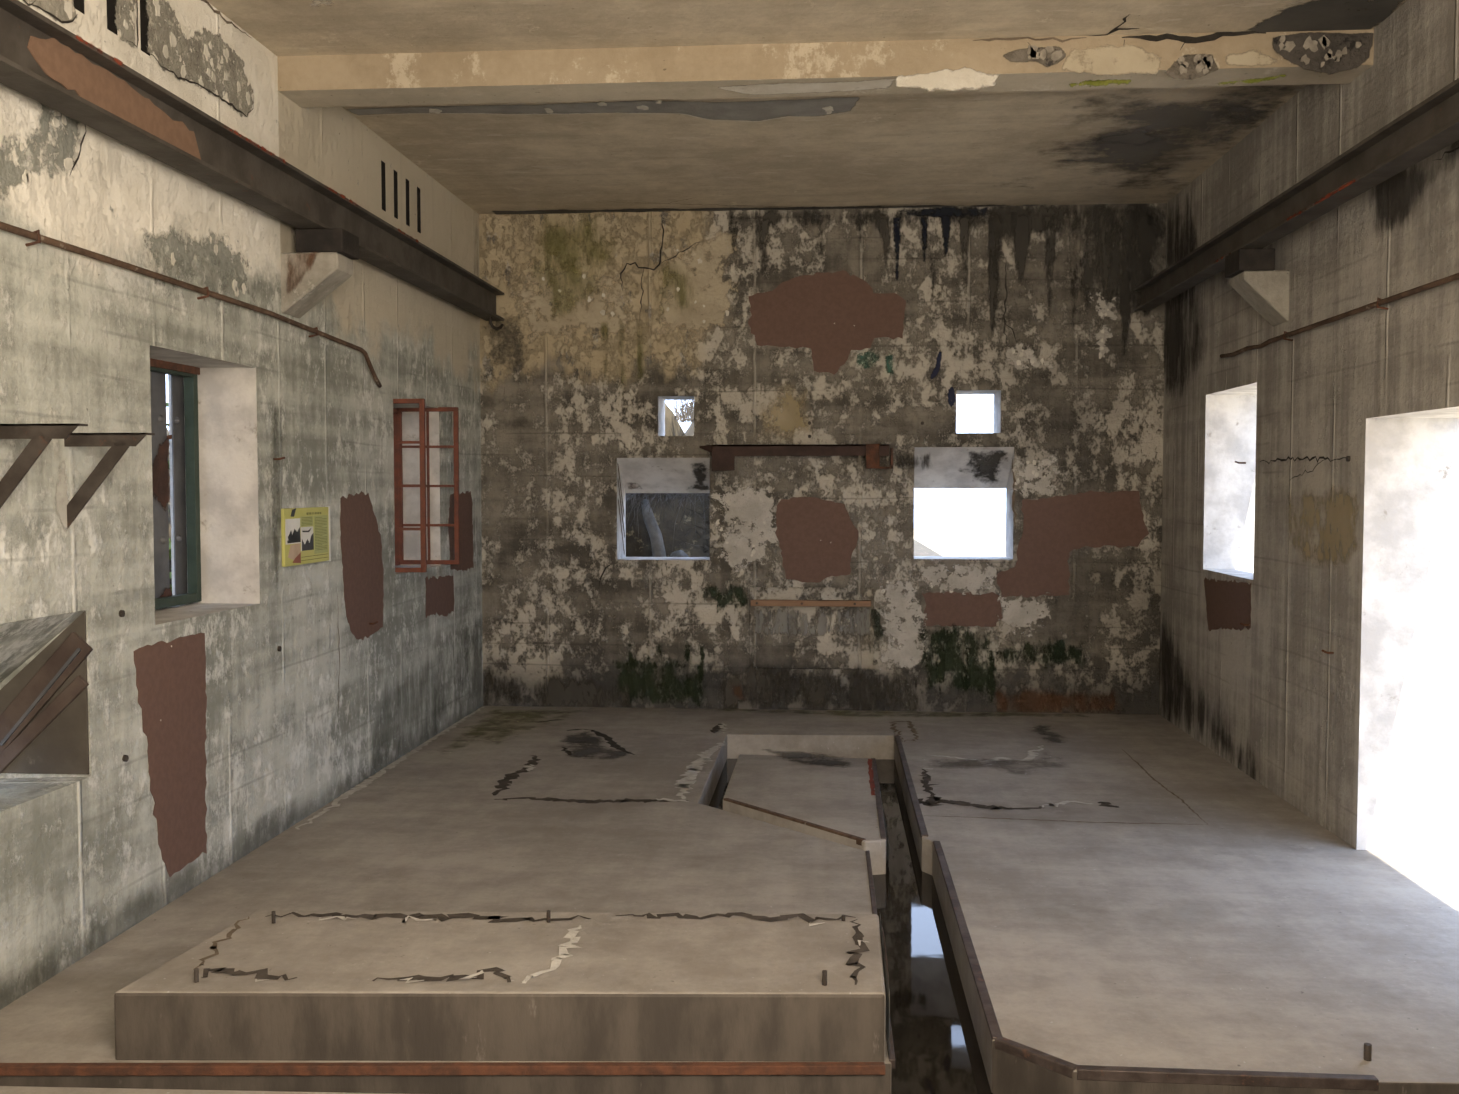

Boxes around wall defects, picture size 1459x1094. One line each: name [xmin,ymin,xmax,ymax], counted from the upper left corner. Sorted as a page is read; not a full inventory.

flaking render [115,0,254,117]
damp [719,67,998,95]
spalling [1003,45,1066,67]
spalling [1272,32,1373,74]
flaking render [0,103,86,200]
damp [1058,86,1292,186]
peeling [655,232,739,338]
damp [489,200,1200,395]
peeling [710,485,779,573]
peeling [874,563,1053,669]
damp [483,671,632,707]
damp [721,663,918,711]